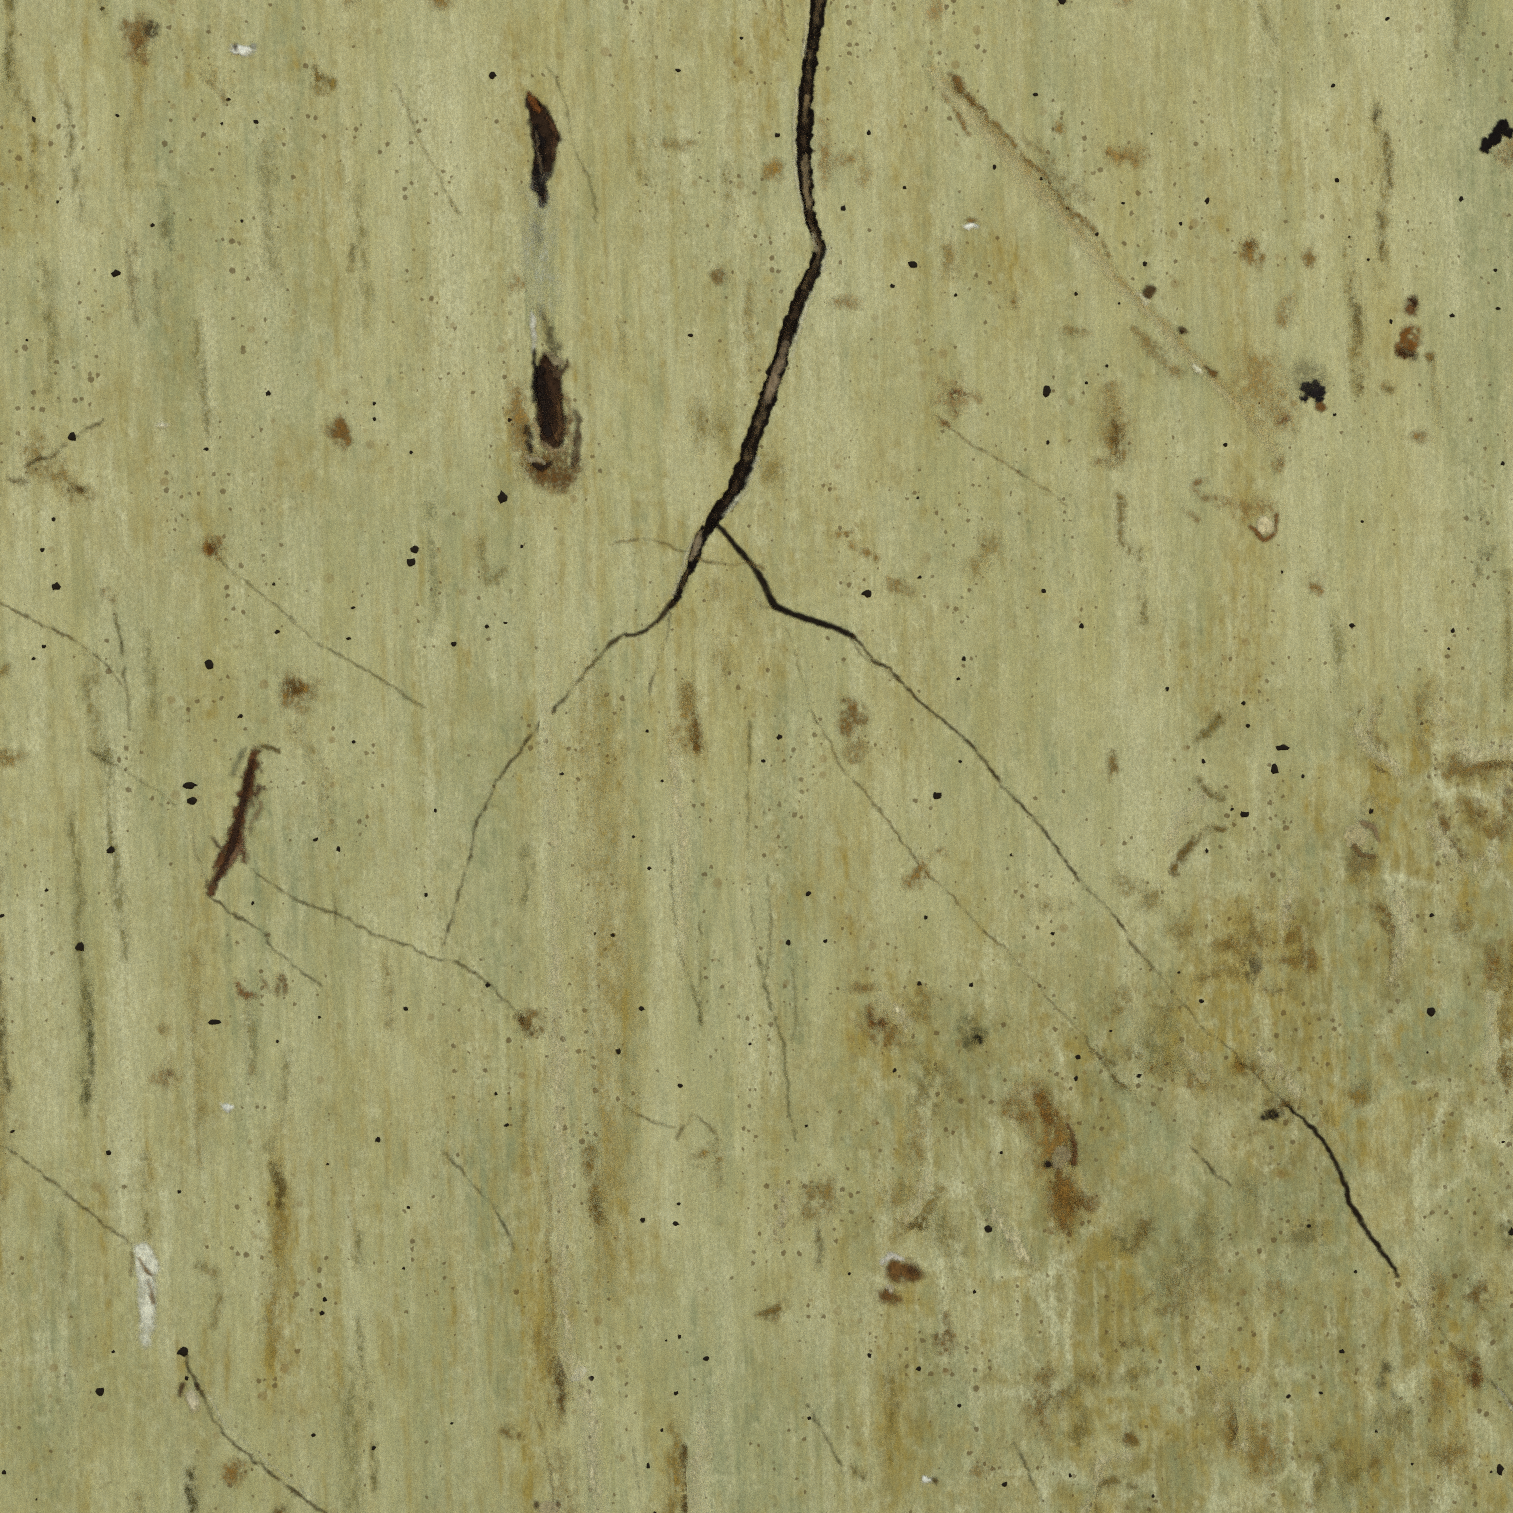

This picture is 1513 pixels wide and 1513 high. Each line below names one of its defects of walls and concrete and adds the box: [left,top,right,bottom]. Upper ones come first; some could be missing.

crack [470,0,1079,880]
crack [1288,1106,1399,1277]